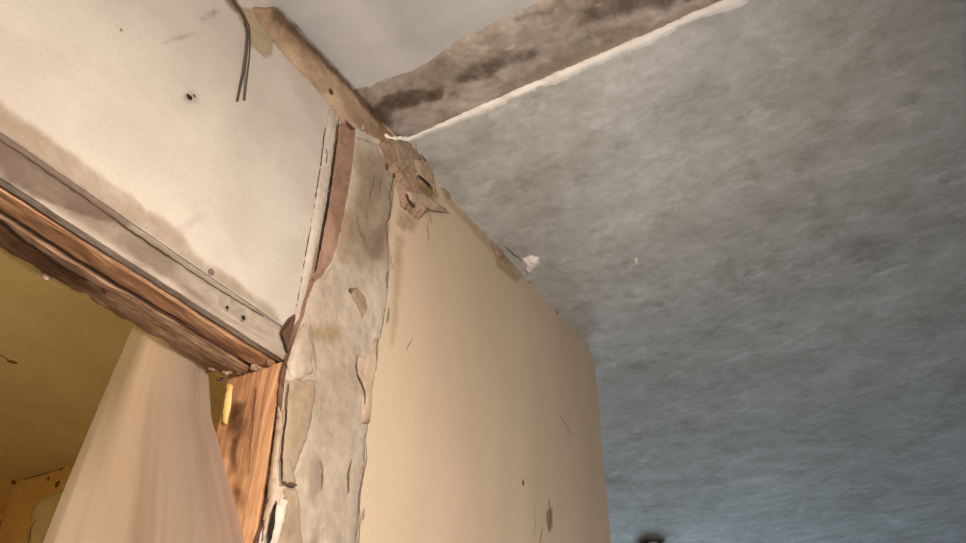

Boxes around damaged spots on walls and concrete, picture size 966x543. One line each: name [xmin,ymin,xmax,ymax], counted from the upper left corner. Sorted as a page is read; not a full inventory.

water stain [612,0,671,12]
water stain [458,40,535,82]
water stain [372,89,442,132]
flaking render [240,0,722,234]
spalling [348,287,367,318]
peeling [278,314,313,381]
spalling [355,338,379,424]
flaking render [264,457,303,543]